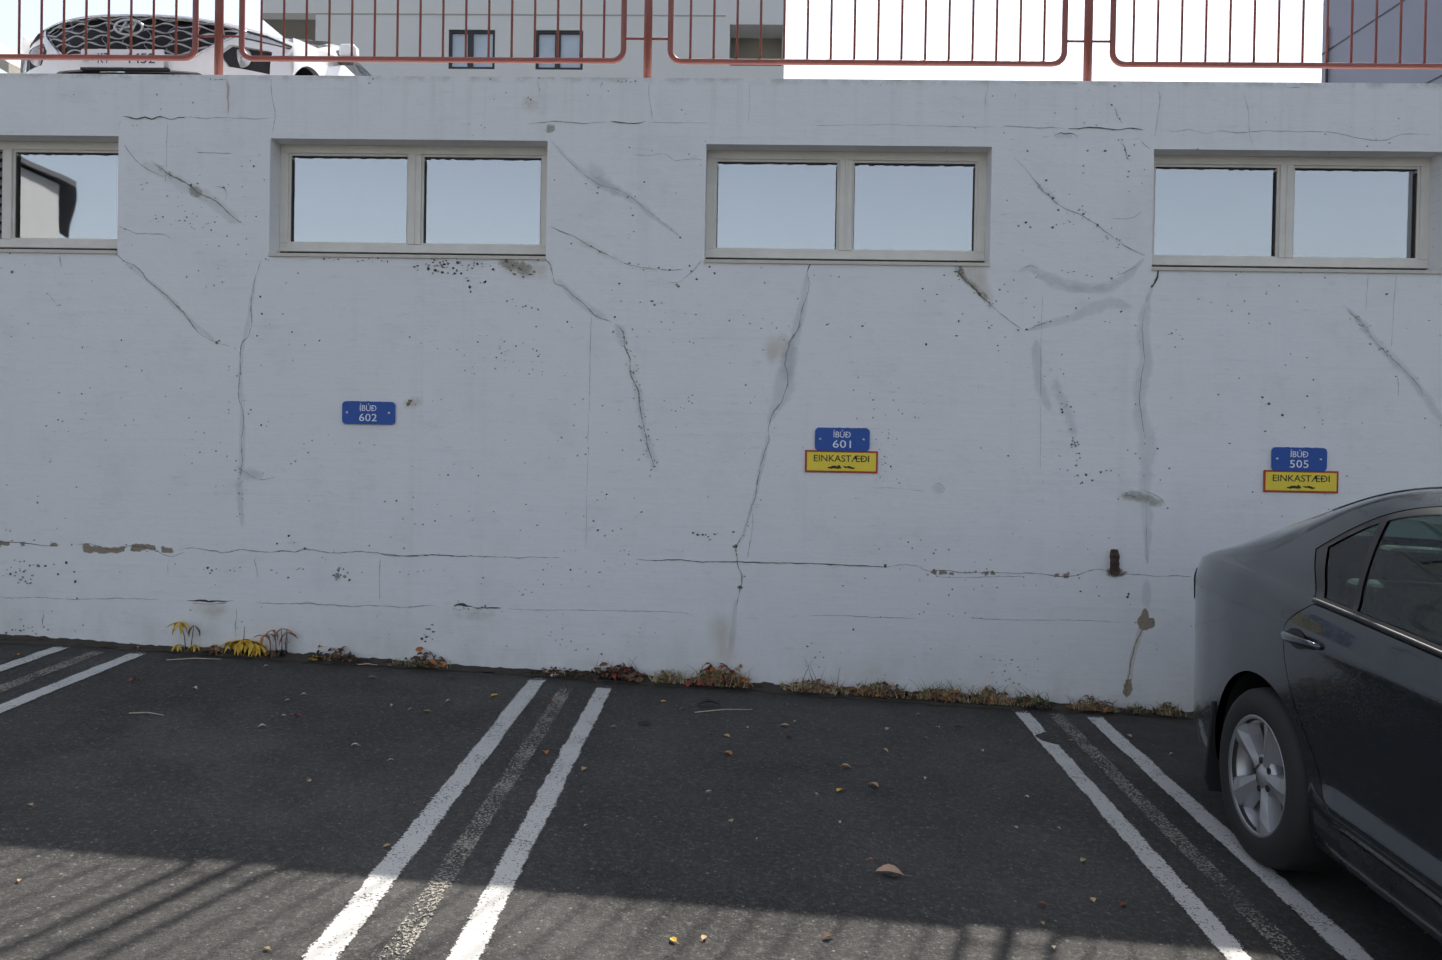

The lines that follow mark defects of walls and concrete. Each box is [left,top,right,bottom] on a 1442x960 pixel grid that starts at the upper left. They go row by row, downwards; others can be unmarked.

crack [123,89,275,223]
crack [117,227,558,569]
crack [538,80,716,477]
crack [639,265,915,603]
crack [1006,166,1183,449]
crack [1350,313,1441,426]